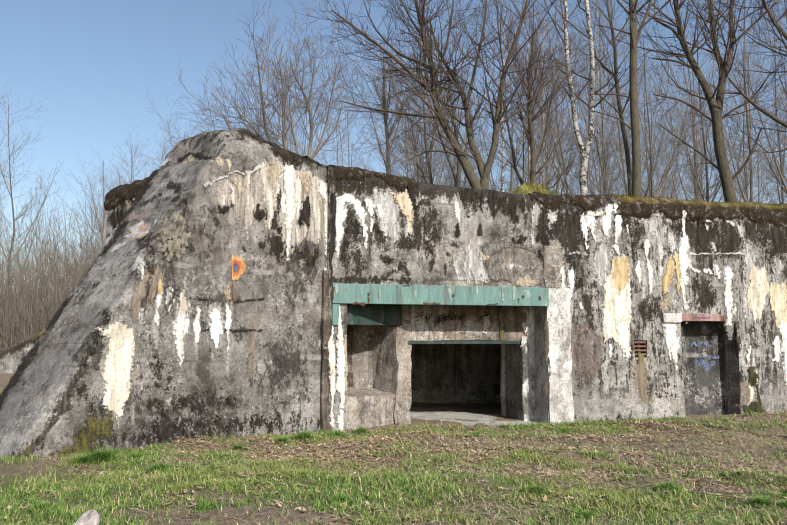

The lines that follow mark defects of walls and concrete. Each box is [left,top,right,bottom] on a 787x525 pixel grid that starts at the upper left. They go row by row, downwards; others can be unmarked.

leakage [213,156,415,294]
leakage [548,341,561,373]
leakage [551,203,787,388]